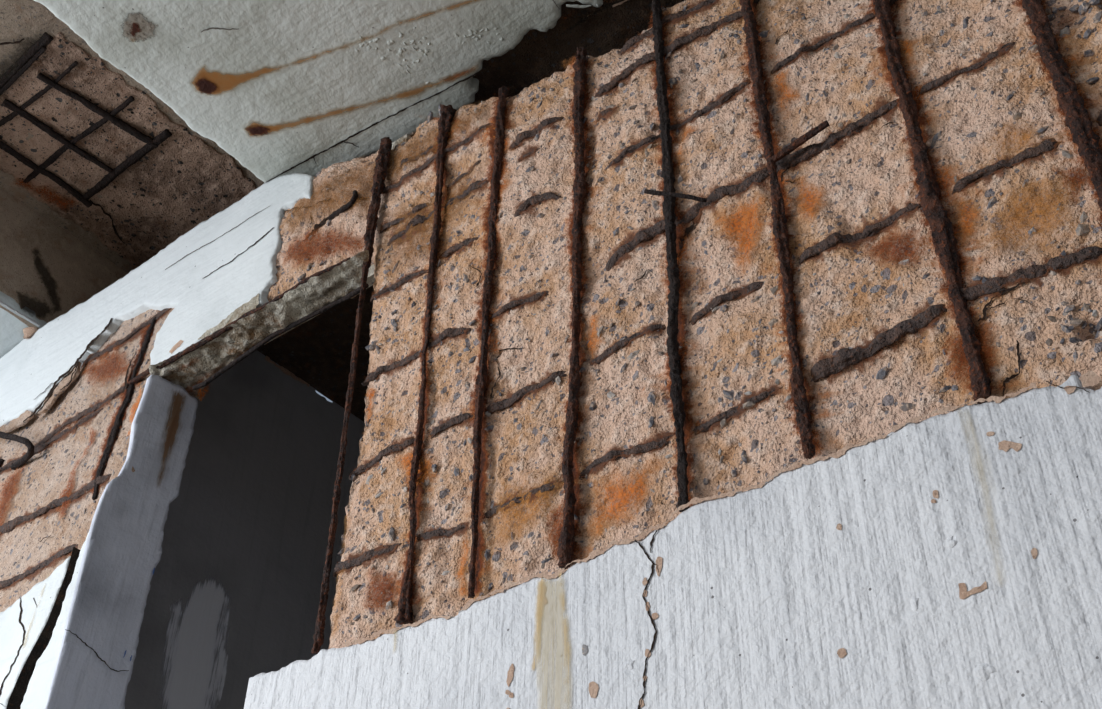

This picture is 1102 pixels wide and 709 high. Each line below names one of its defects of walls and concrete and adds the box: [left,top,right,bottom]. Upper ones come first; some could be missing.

spalling [0,32,257,270]
rust [192,0,478,95]
rust [245,69,475,136]
rust [285,106,483,265]
crack [553,0,628,30]
spalling [0,374,151,612]
spalling [0,308,174,525]
rust [158,380,209,482]
spalling [149,0,1102,654]
crack [1003,340,1021,395]
crack [0,535,129,709]
crack [635,530,659,709]